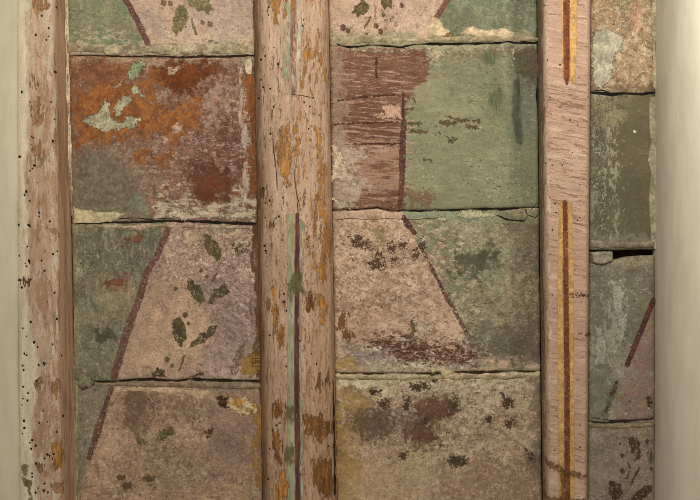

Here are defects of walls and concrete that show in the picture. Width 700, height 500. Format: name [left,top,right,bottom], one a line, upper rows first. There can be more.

crack [71,52,254,60]
rust [69,59,217,169]
rust [240,61,257,198]
peeling [333,94,484,144]
rust [184,159,232,206]
crack [74,217,257,225]
crack [334,201,539,222]
peeling [264,280,285,350]
crack [81,378,260,390]
peeling [267,398,290,500]
crack [333,370,536,495]
peeling [310,455,335,500]